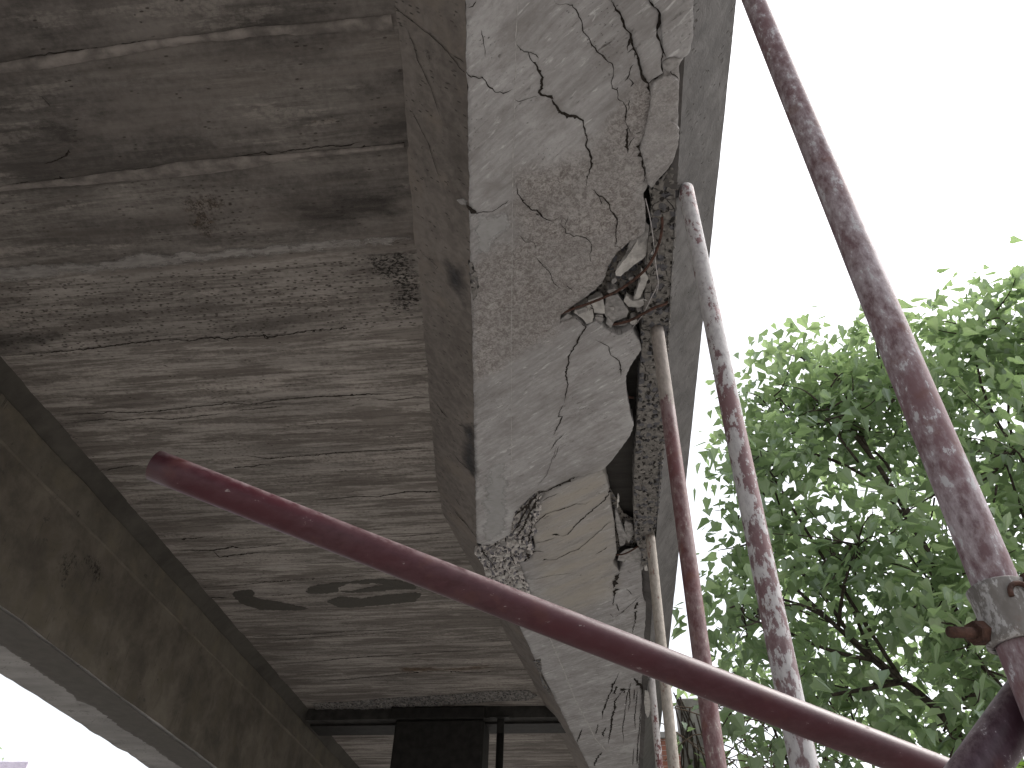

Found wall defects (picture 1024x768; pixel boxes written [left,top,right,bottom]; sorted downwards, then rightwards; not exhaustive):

crack [558,0,678,180]
crack [10,326,357,356]
crack [521,237,622,580]
spalling [560,0,694,604]
spalling [474,491,543,594]
crack [577,673,641,766]